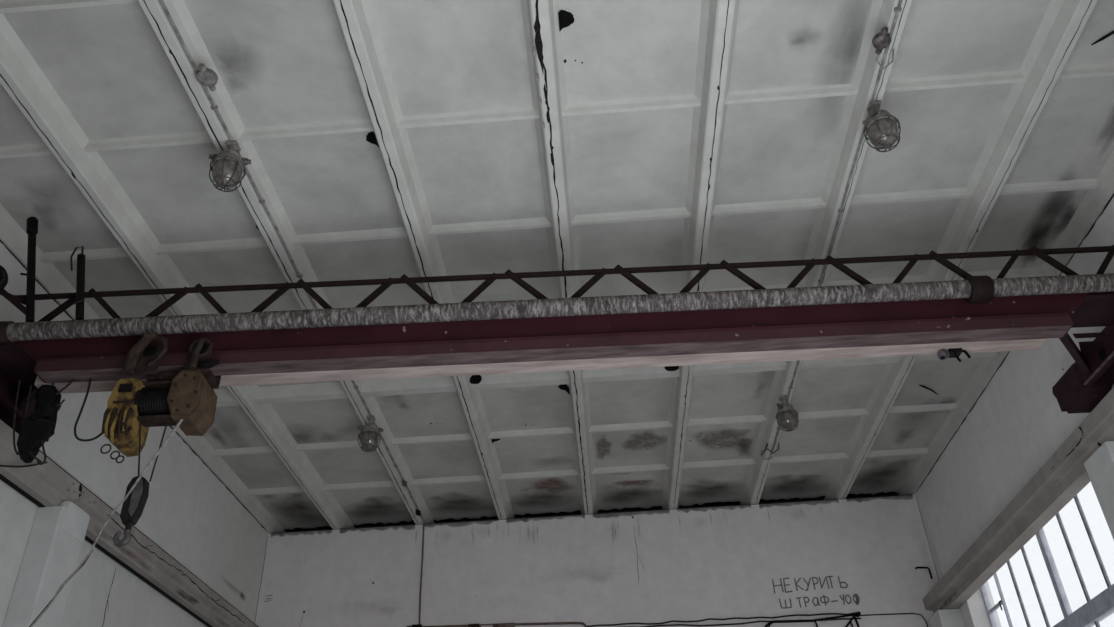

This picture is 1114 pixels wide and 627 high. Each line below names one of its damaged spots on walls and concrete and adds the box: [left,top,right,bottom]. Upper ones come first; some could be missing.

crack [340,0,434,299]
crack [535,0,567,298]
crack [457,377,502,519]
crack [573,371,588,513]